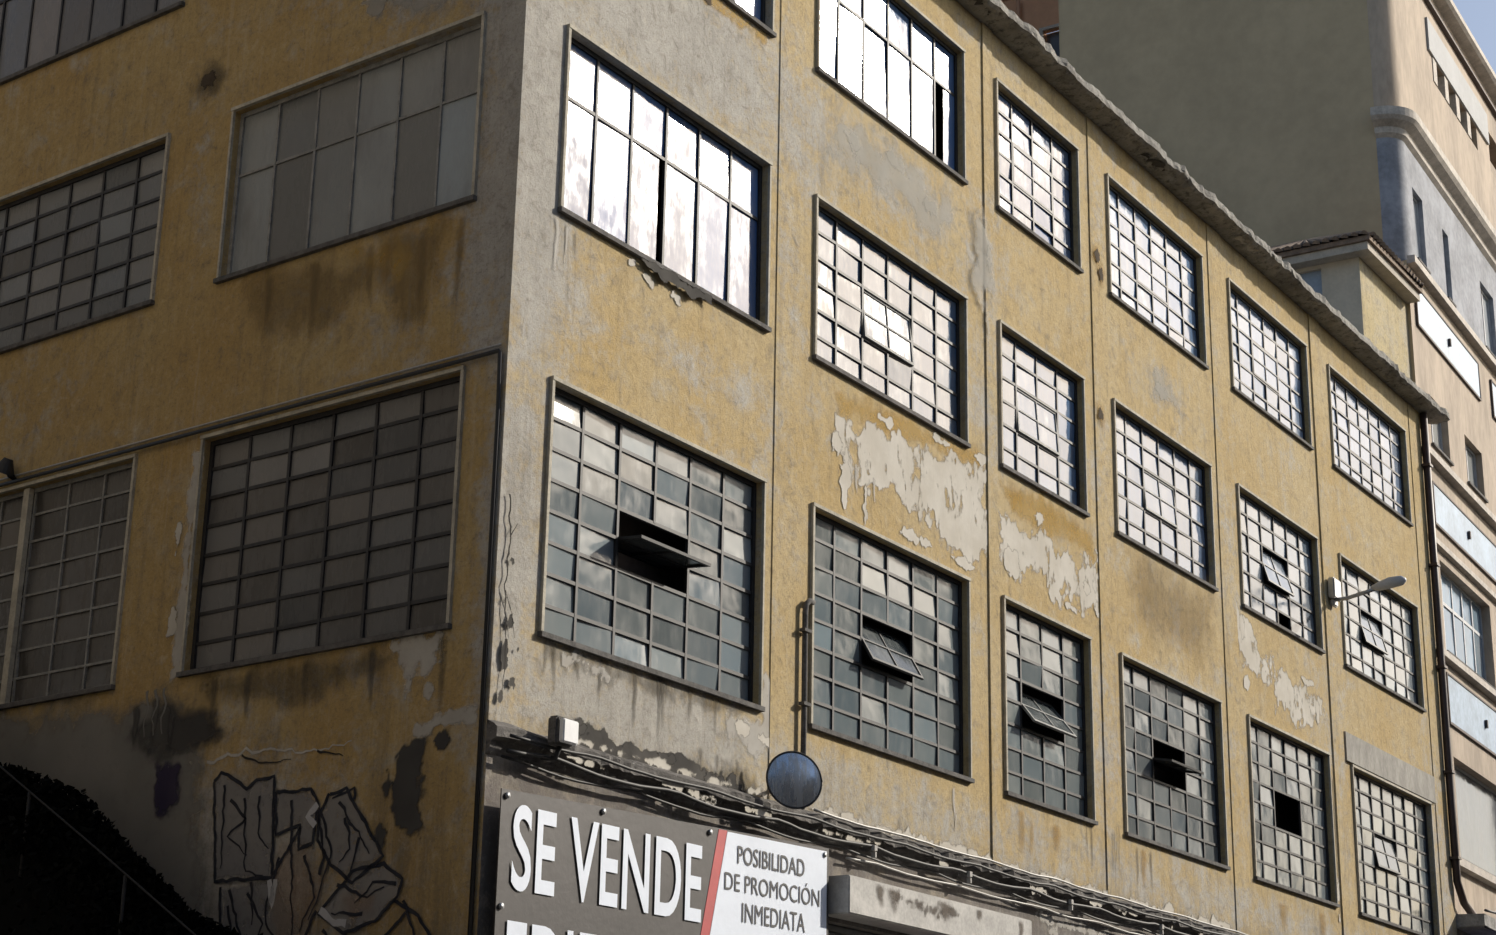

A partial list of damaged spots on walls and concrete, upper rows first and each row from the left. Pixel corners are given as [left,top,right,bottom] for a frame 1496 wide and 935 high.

peeling [832,413,1099,618]
crack [502,494,518,693]
damp [562,649,610,683]
peeling [1236,601,1323,729]
spalling [575,717,745,792]